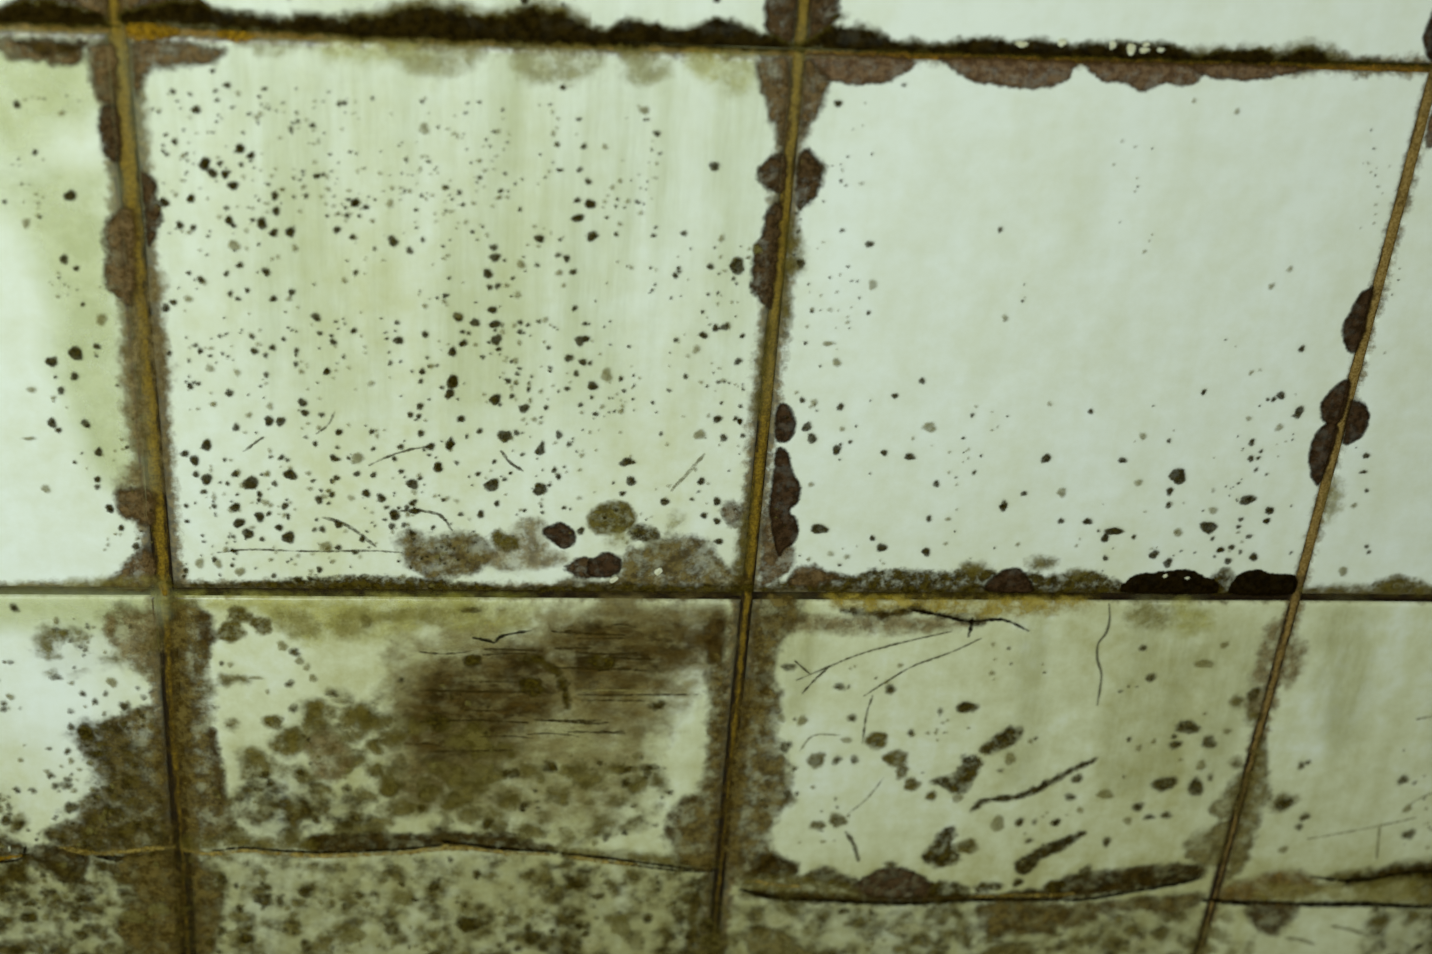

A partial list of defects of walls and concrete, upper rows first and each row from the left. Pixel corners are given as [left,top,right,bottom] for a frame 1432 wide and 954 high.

rust [125,22,181,41]
rust [217,30,255,43]
water stain [0,0,1432,327]
water stain [102,129,474,454]
mould [419,245,558,423]
water stain [0,287,1432,954]
crack [795,609,1024,734]
crack [1096,608,1110,705]
crack [0,847,26,863]
crack [60,840,1432,909]